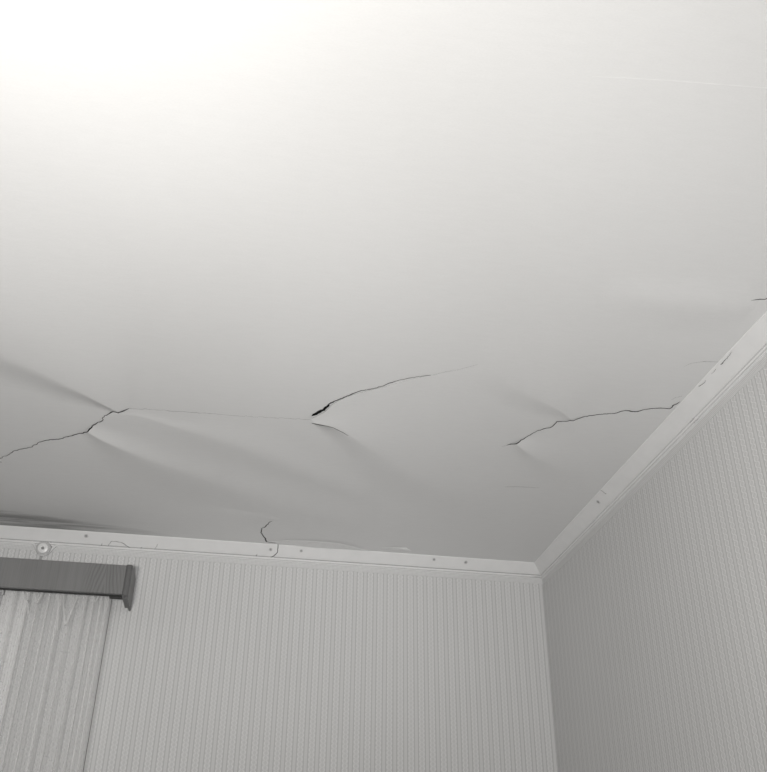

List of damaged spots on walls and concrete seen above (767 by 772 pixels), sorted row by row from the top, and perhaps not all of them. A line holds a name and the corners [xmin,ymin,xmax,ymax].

crack [288,365,474,436]
crack [506,397,679,446]